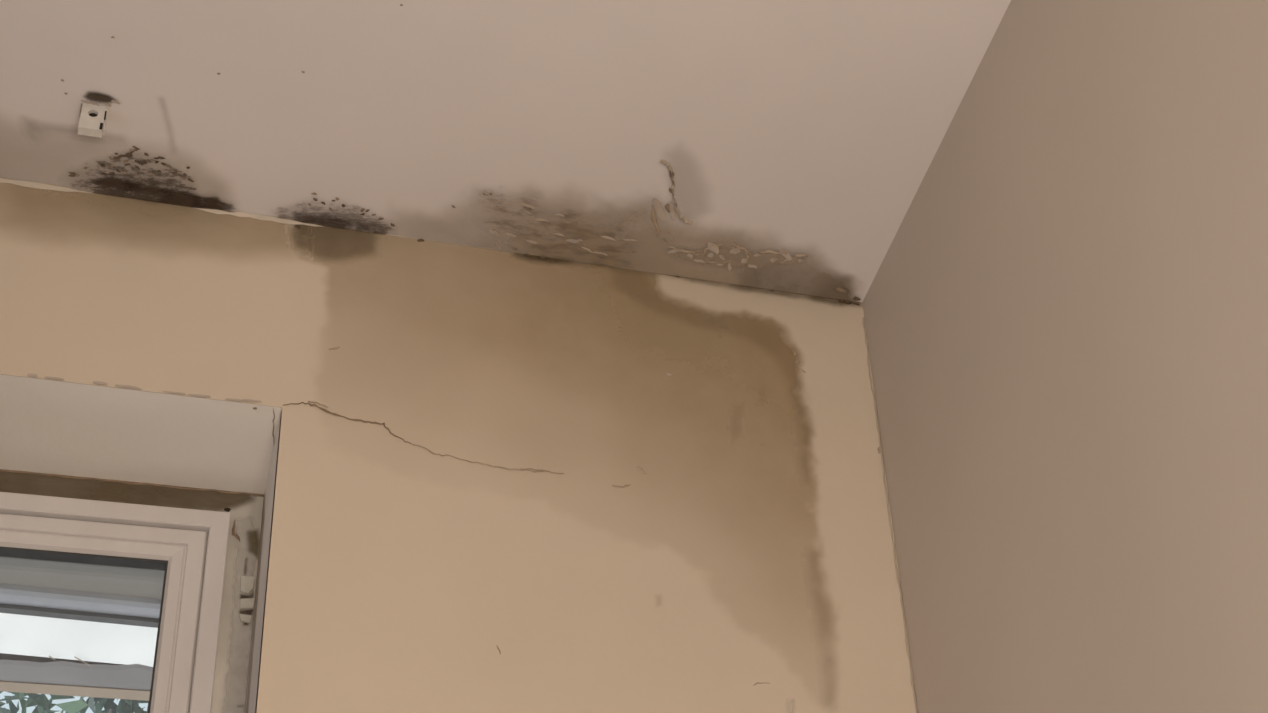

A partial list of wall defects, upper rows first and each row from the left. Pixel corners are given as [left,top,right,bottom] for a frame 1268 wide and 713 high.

leakage [20,146,231,219]
leakage [293,192,395,233]
peeling [651,198,808,271]
leakage [487,211,860,443]
crack [272,401,564,474]